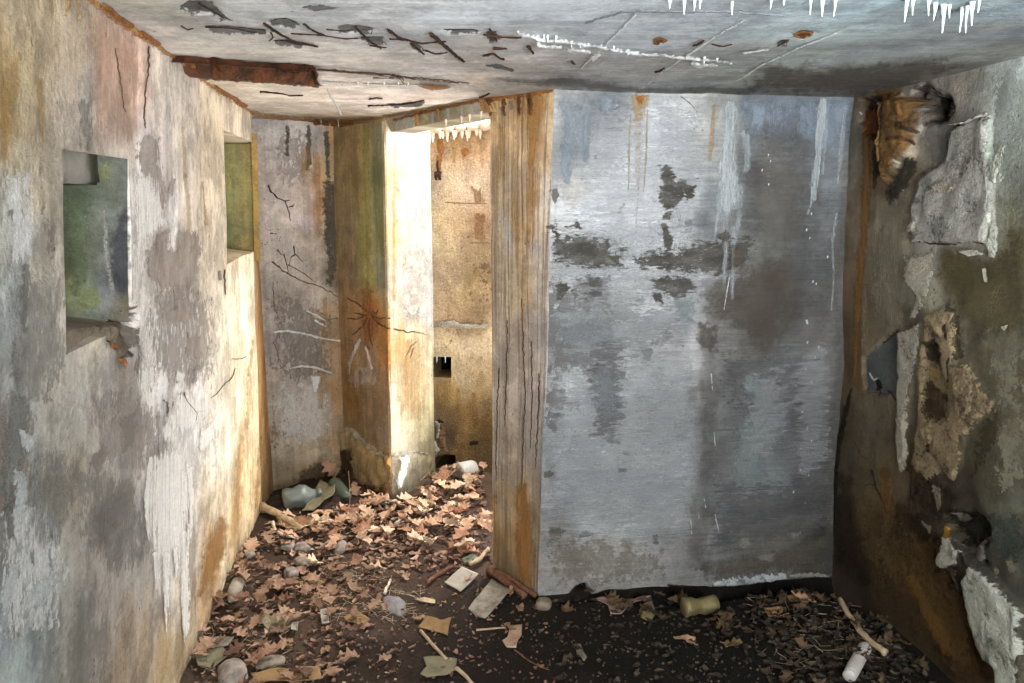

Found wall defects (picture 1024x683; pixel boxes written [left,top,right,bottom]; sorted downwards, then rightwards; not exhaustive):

damp [102,209,130,295]
crack [115,46,150,128]
rust [86,0,553,211]
damp [305,125,337,287]
crack [267,185,425,393]
rust [628,95,648,233]
damp [507,14,954,349]
rust [852,94,933,381]
peeling [958,212,998,258]
efflorescence [144,448,195,642]
rust [515,485,533,584]
spalling [865,252,1024,683]